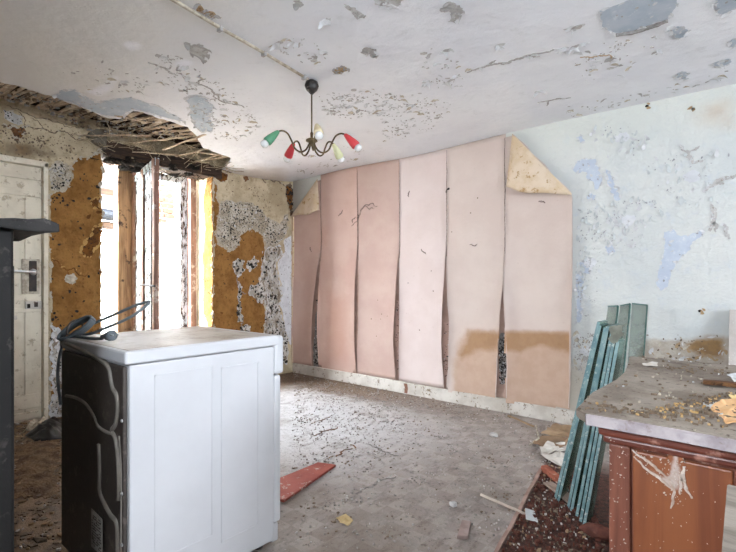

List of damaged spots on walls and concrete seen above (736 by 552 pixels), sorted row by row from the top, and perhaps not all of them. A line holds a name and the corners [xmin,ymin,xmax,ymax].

spalling [3,110,27,141]
peeling [52,42,261,141]
crack [148,62,244,114]
peeling [319,47,471,142]
crack [467,49,554,73]
crack [580,54,613,62]
peeling [568,0,691,80]
peeling [667,59,731,93]
spalling [48,148,105,418]
spalling [202,172,294,365]
peeling [571,158,664,381]
leakage [442,322,570,410]